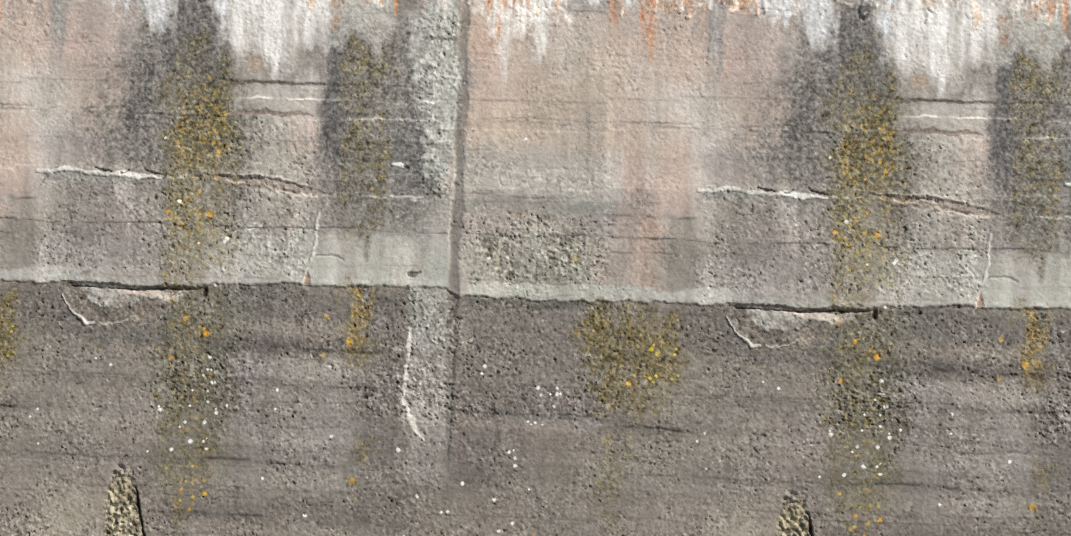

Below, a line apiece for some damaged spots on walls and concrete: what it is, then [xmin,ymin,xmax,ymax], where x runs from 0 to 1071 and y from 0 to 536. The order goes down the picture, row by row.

leakage [29,0,75,69]
corrosion [607,0,621,40]
corrosion [636,0,671,65]
leakage [68,0,640,265]
leakage [656,0,1071,287]
spalling [102,468,146,536]
spalling [775,494,815,536]